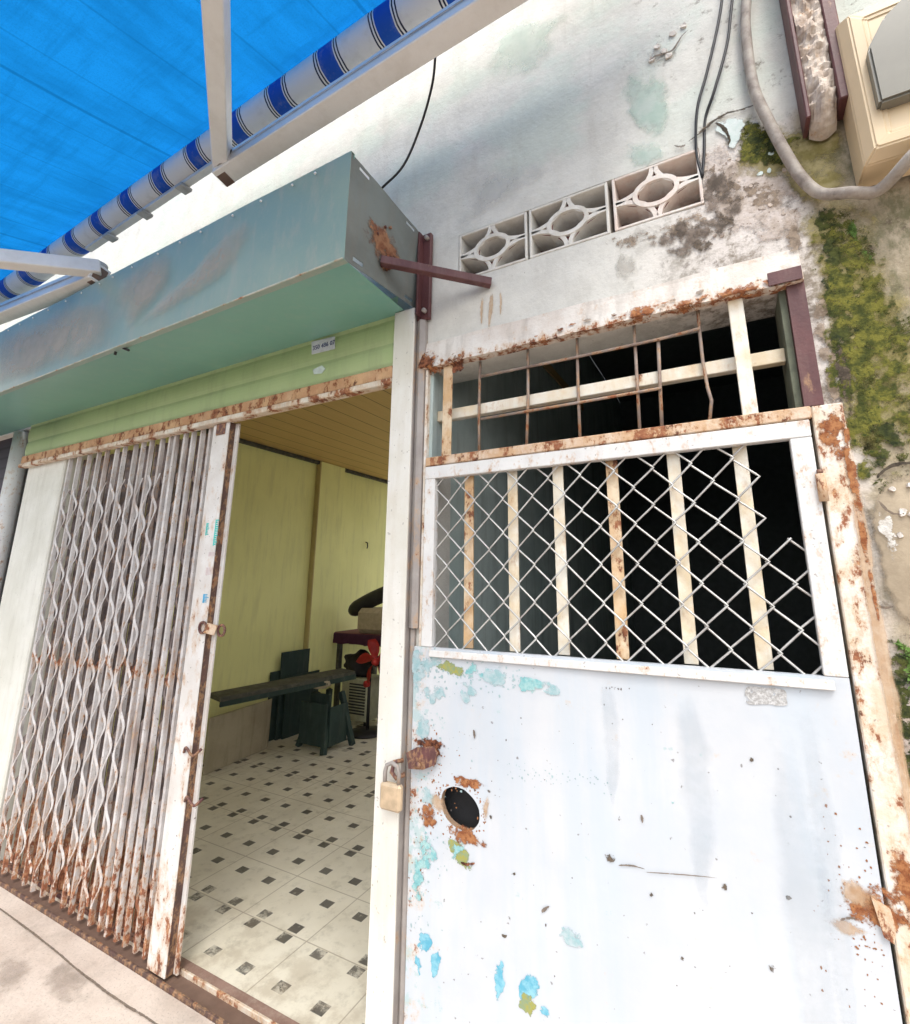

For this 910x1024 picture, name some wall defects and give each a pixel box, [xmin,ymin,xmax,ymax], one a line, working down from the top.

water stain [629,81,666,130]
flaking render [703,118,805,241]
water stain [612,166,781,275]
corrosion [623,306,655,324]
corrosion [718,280,775,304]
corrosion [418,352,464,375]
water stain [813,299,853,416]
corrosion [818,411,910,828]
peeling [412,650,506,704]
peeling [448,839,472,871]
corrosion [835,850,910,934]
peeling [519,975,549,1017]